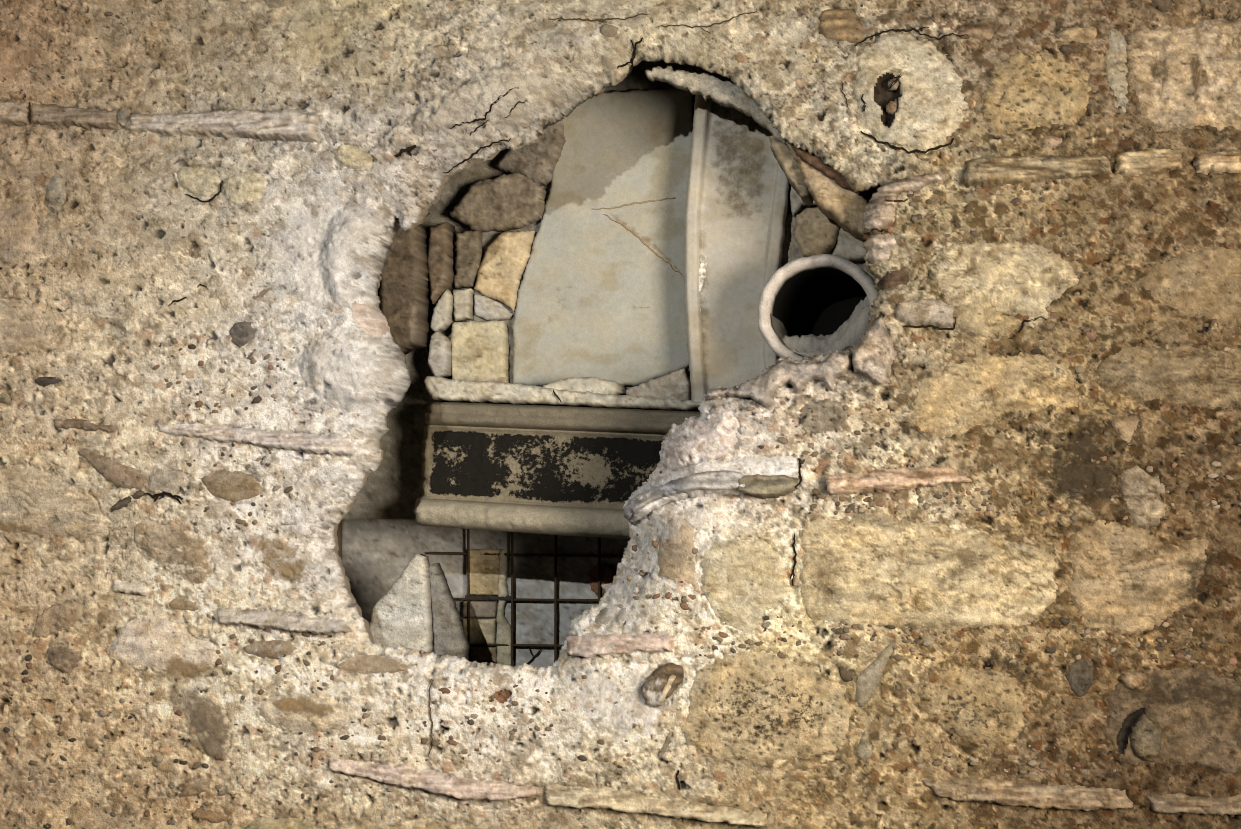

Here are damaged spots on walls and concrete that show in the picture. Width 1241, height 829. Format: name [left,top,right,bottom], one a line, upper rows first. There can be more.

crack [549,11,757,75]
spalling [874,72,902,128]
crack [443,87,527,173]
spalling [769,135,945,292]
spalling [352,301,390,338]
spalling [800,399,847,435]
spalling [588,563,616,597]
crack [789,533,797,586]